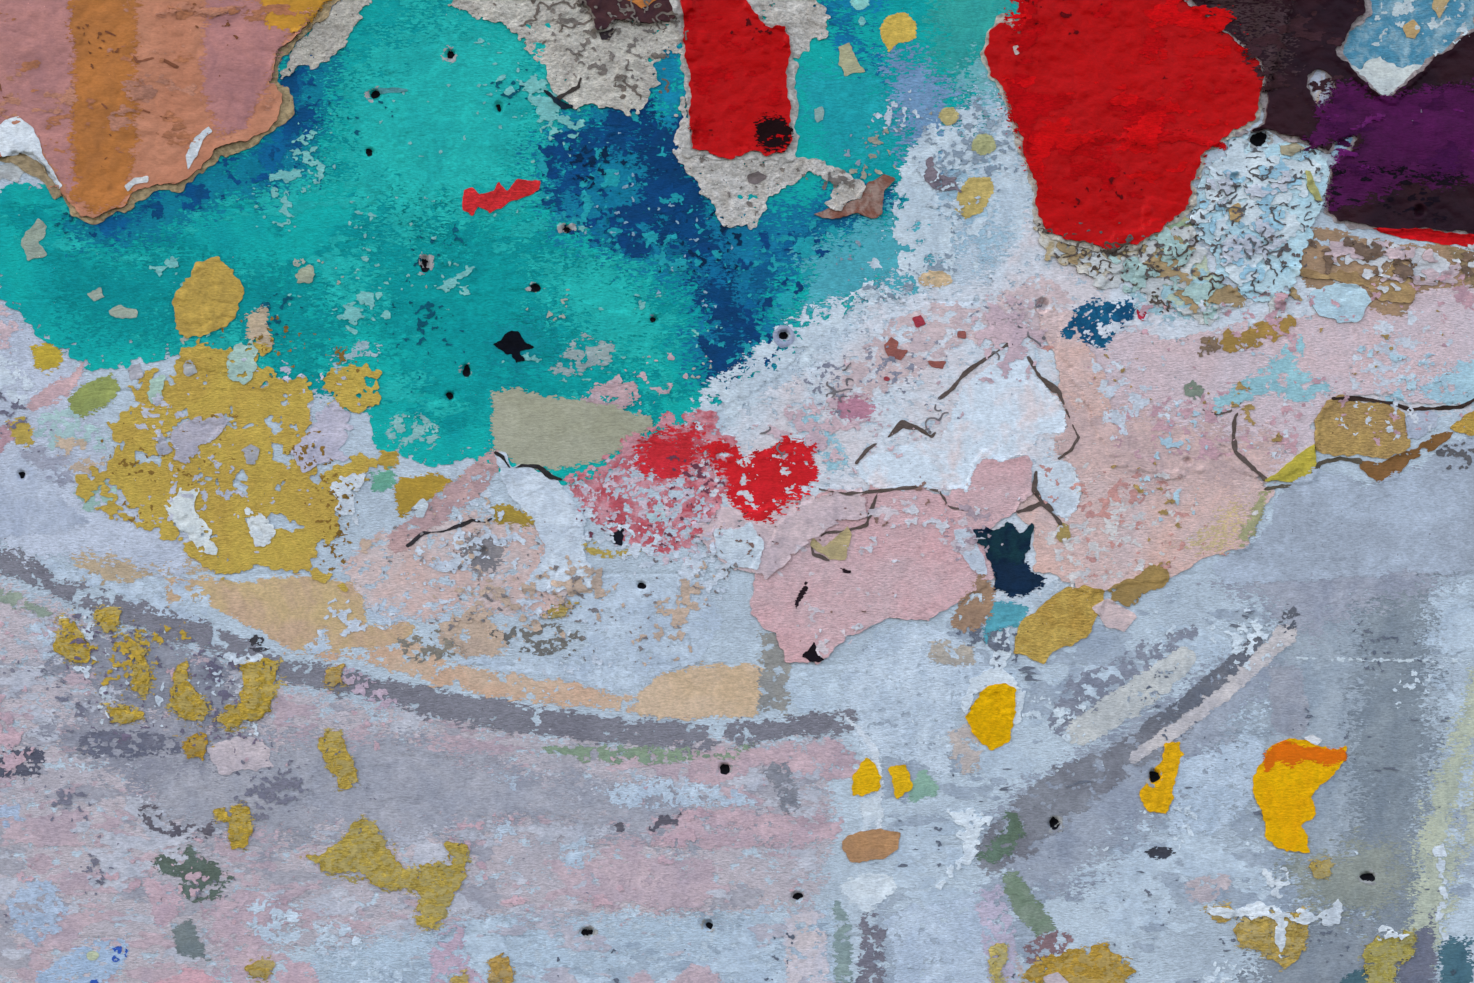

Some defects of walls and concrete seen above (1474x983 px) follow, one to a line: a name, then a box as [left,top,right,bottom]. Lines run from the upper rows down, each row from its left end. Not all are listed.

peeling [0,0,372,225]
peeling [448,0,895,230]
peeling [152,413,229,464]
peeling [226,340,258,385]
peeling [290,362,382,525]
crack [760,426,785,457]
crack [811,325,1080,561]
peeling [640,0,1474,665]
crack [1203,402,1362,490]
crack [1331,396,1474,411]
peeling [164,487,218,555]
peeling [244,507,276,547]